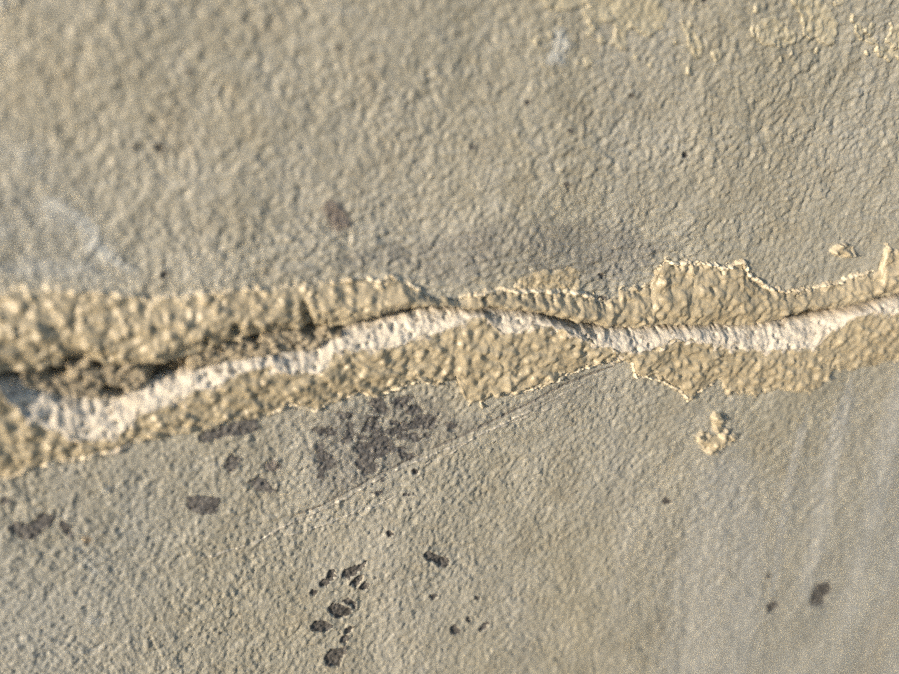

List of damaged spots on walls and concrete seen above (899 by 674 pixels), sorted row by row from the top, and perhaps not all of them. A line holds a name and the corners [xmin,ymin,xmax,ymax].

peeling [543,0,669,68]
peeling [674,19,722,76]
peeling [750,0,844,63]
peeling [850,14,899,63]
peeling [829,242,857,258]
crack [0,294,899,456]
peeling [694,410,738,456]